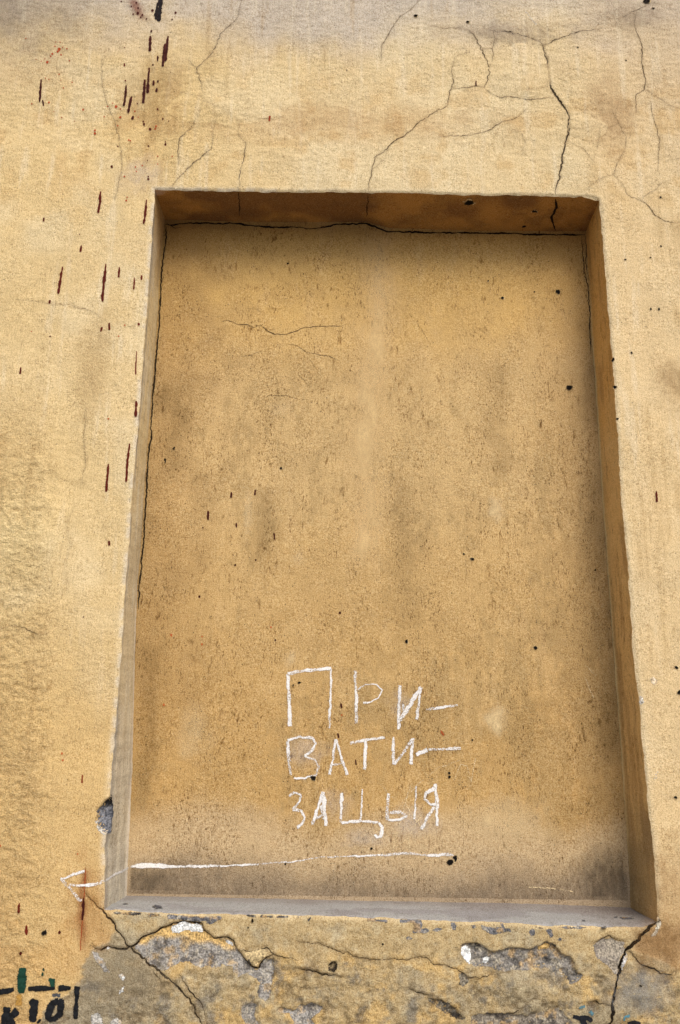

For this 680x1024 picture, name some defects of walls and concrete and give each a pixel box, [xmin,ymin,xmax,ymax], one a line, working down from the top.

corrosion [104,0,177,131]
corrosion [101,264,120,302]
crack [138,7,680,607]
spalling [96,795,114,835]
peeling [92,947,125,994]
spalling [114,903,275,1024]
crack [86,894,512,1024]
spalling [459,920,586,986]
spalling [593,916,633,974]
crack [593,921,672,1024]
peeling [91,1013,122,1024]